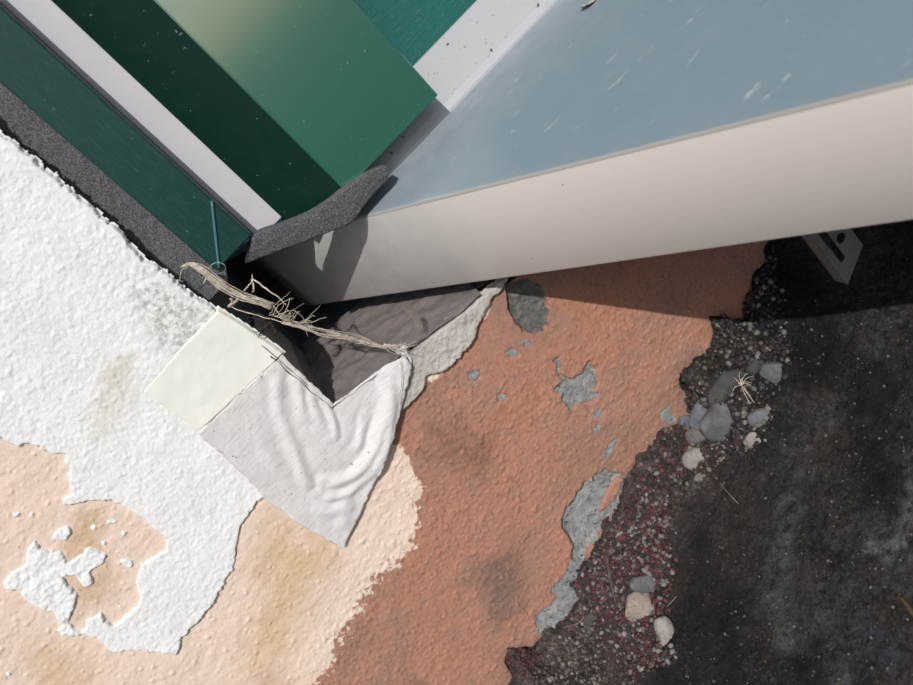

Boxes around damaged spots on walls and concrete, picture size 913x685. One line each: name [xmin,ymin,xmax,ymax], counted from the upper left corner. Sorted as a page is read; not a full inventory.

peeling [0,130,264,655]
peeling [401,277,549,411]
spalling [553,358,603,432]
spalling [660,406,677,426]
spalling [535,438,626,635]